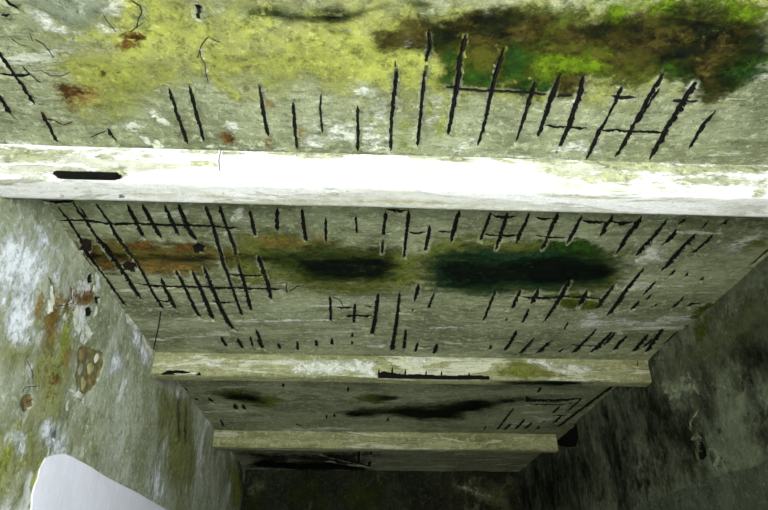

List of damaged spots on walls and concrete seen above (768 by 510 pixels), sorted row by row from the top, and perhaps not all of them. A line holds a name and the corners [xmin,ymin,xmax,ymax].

leakage [250,7,359,23]
crack [11,34,70,83]
corrosion [115,32,146,52]
corrosion [76,234,323,277]
leakage [0,229,59,344]
crack [47,276,76,306]
spalling [46,200,280,412]
leakage [226,230,693,328]
corrosion [35,285,95,386]
spalling [20,394,33,412]
leakage [347,394,524,420]
crack [557,386,613,427]